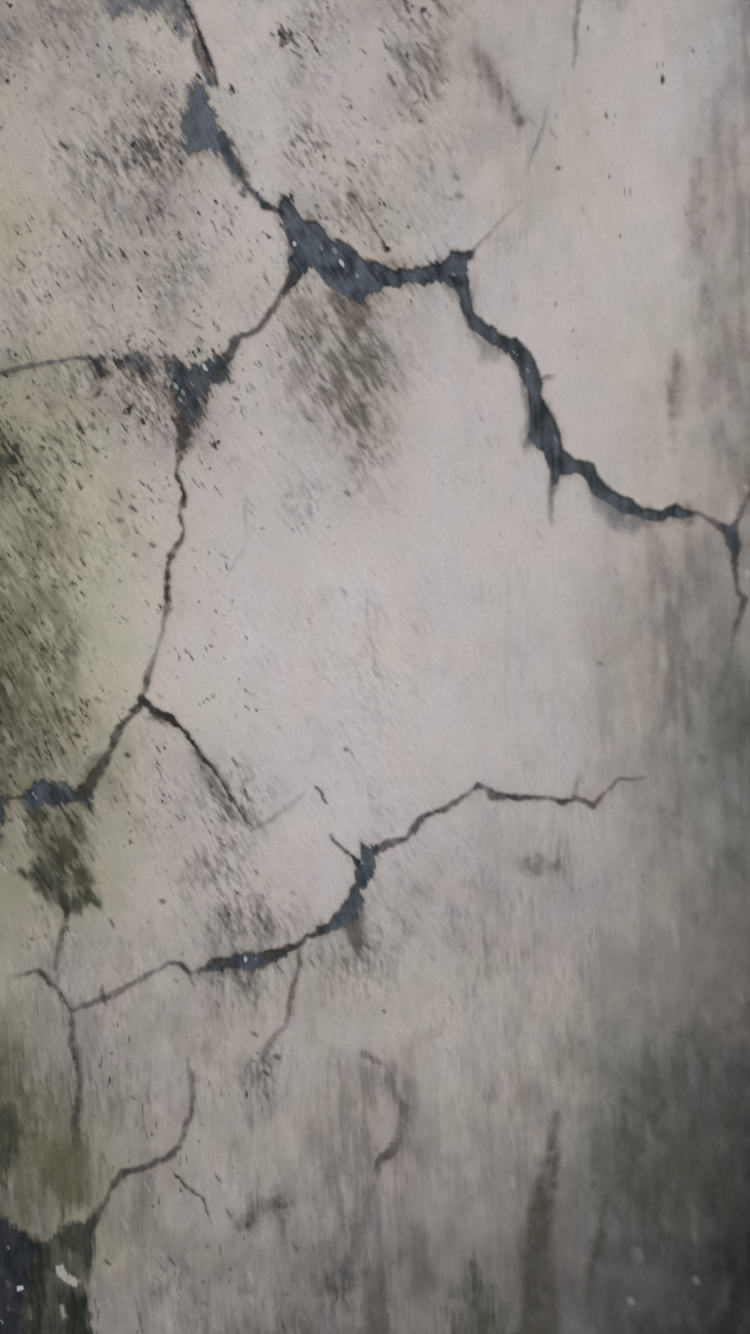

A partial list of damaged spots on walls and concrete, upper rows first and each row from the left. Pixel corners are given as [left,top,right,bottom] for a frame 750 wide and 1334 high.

crack [183,0,218,84]
crack [217,131,283,214]
crack [221,270,299,364]
crack [372,226,390,251]
crack [164,415,188,616]
crack [450,276,747,623]
crack [74,667,251,825]
crack [331,778,623,861]
crack [28,958,233,1128]
crack [264,928,324,1012]
crack [84,1098,208,1267]
leakage [522,1141,557,1334]